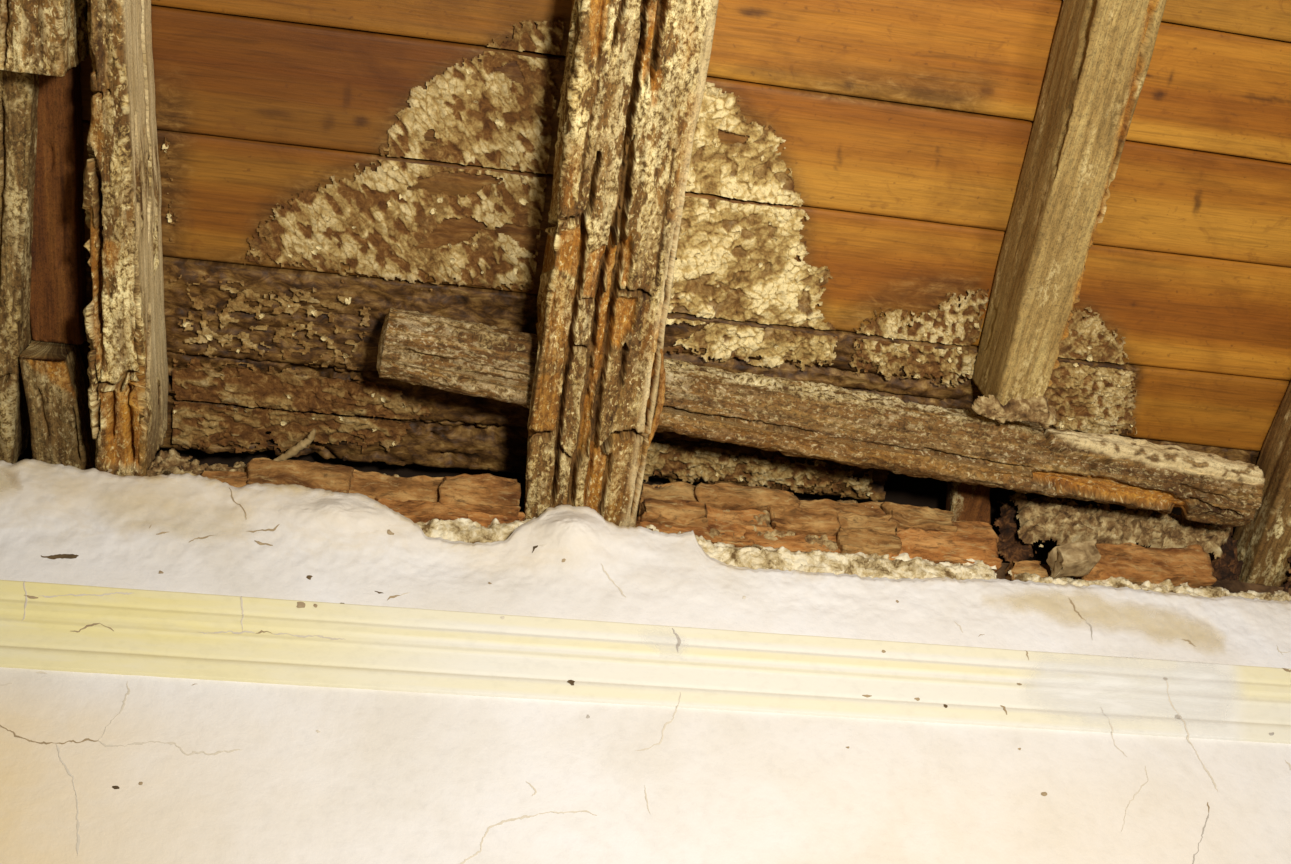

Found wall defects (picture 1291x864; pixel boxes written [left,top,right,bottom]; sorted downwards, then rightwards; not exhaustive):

spalling [636,440,1291,601]
leakage [1015,595,1211,643]
crack [0,681,240,856]
crack [1166,680,1218,864]